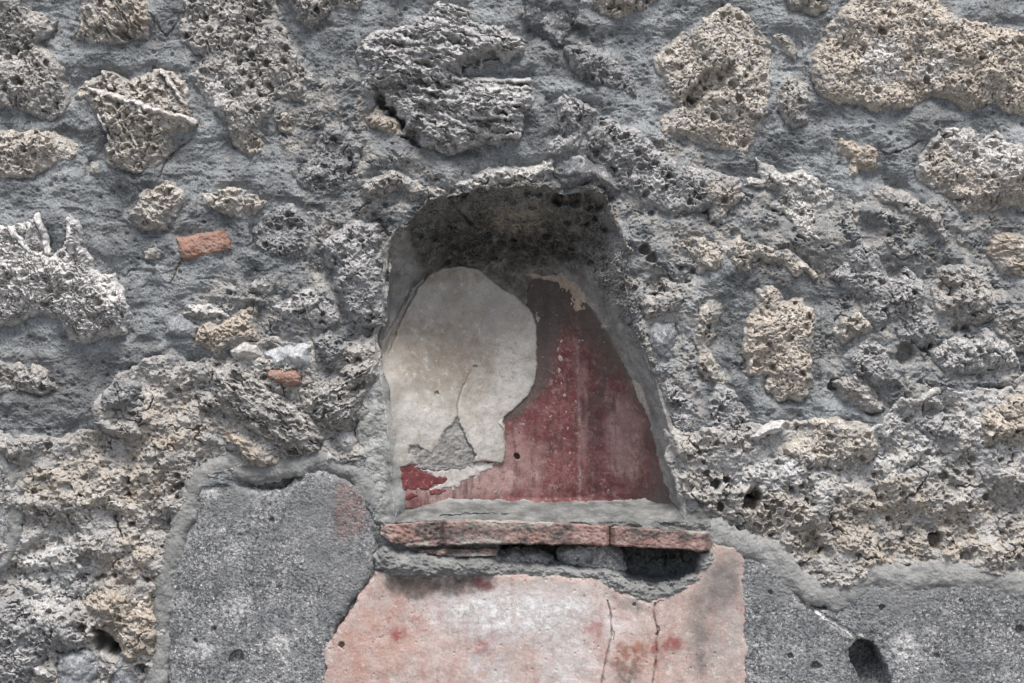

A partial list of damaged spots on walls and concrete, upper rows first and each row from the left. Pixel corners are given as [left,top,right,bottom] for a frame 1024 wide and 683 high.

spalling [400,417,499,500]